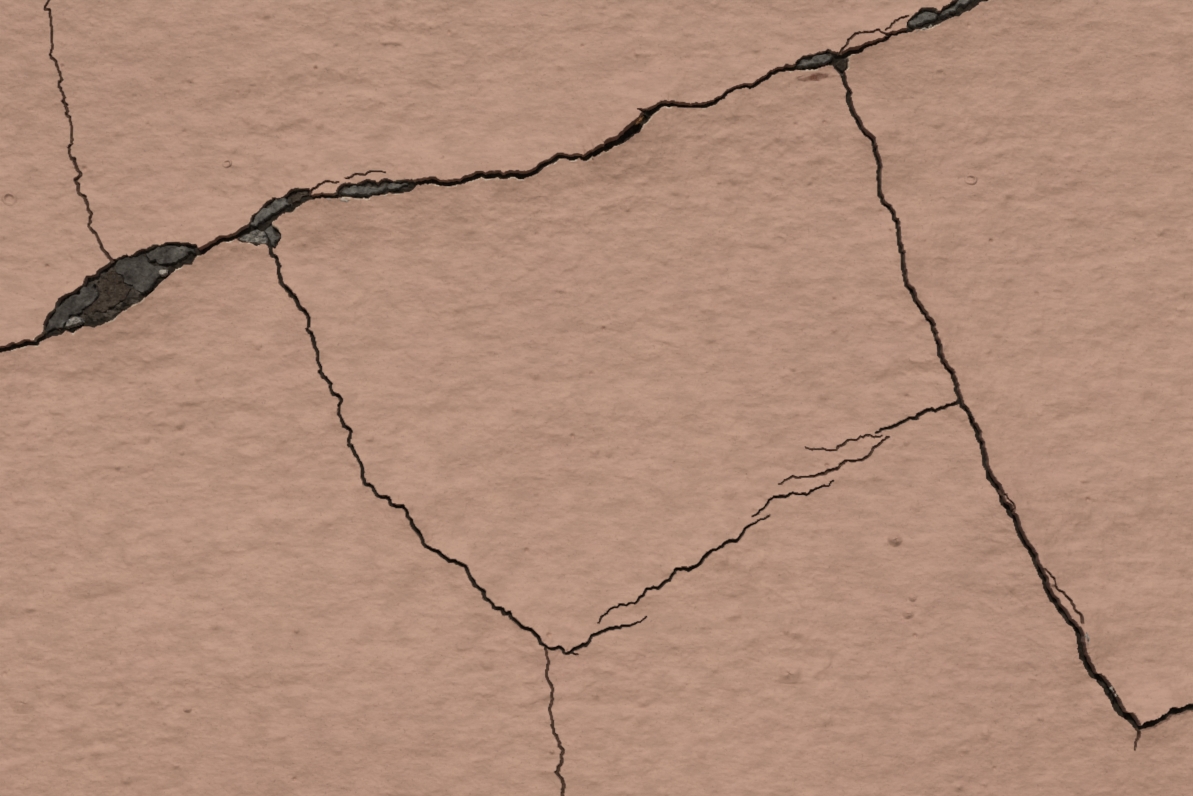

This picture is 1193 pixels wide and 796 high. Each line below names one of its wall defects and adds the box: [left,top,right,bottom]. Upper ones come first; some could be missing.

crack [44,0,115,263]
crack [0,306,130,353]
spalling [45,243,203,334]
crack [138,0,986,796]
crack [599,75,1193,751]